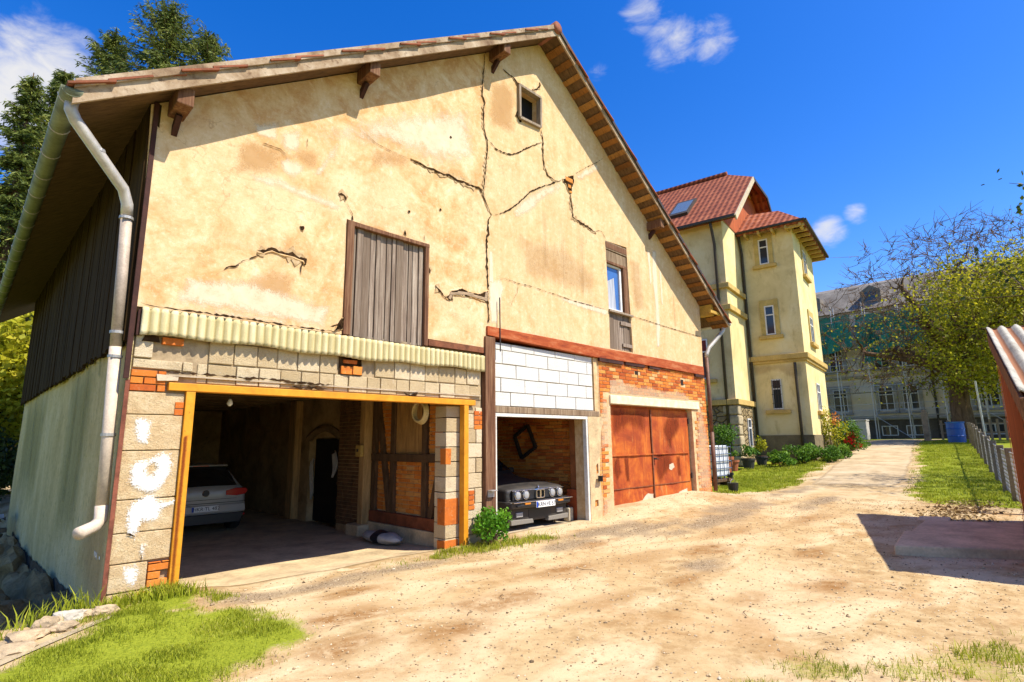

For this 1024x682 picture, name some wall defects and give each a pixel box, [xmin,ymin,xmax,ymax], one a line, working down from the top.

crack [216,245,307,275]
crack [372,52,605,323]